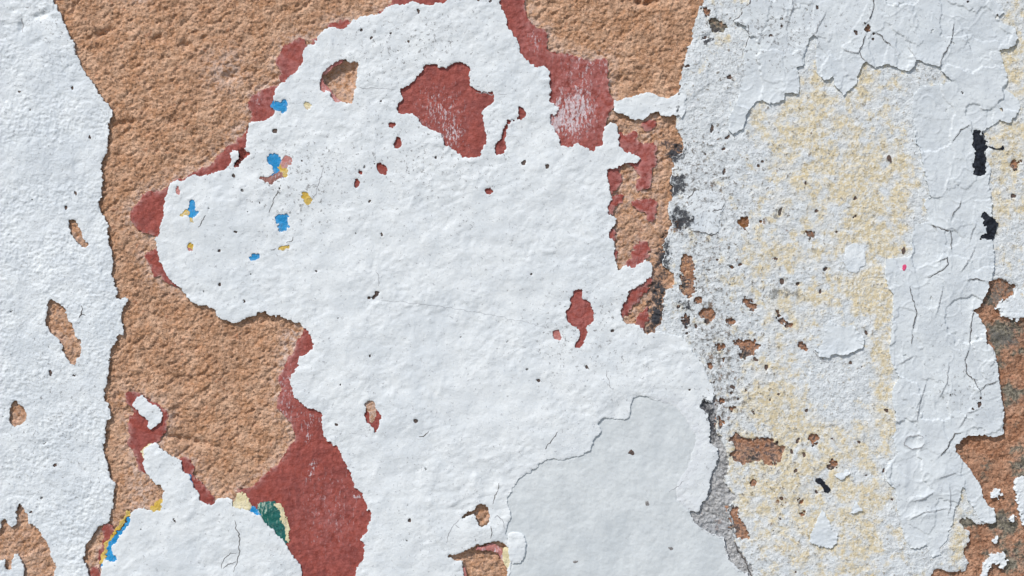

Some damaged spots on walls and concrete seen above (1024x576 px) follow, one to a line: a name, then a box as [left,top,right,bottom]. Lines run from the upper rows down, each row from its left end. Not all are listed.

peeling [388,62,526,158]
crack [844,0,971,66]
peeling [45,299,81,377]
peeling [54,0,447,576]
peeling [448,0,1024,576]
crack [902,203,984,363]
crack [912,312,997,518]
peeling [0,503,57,576]